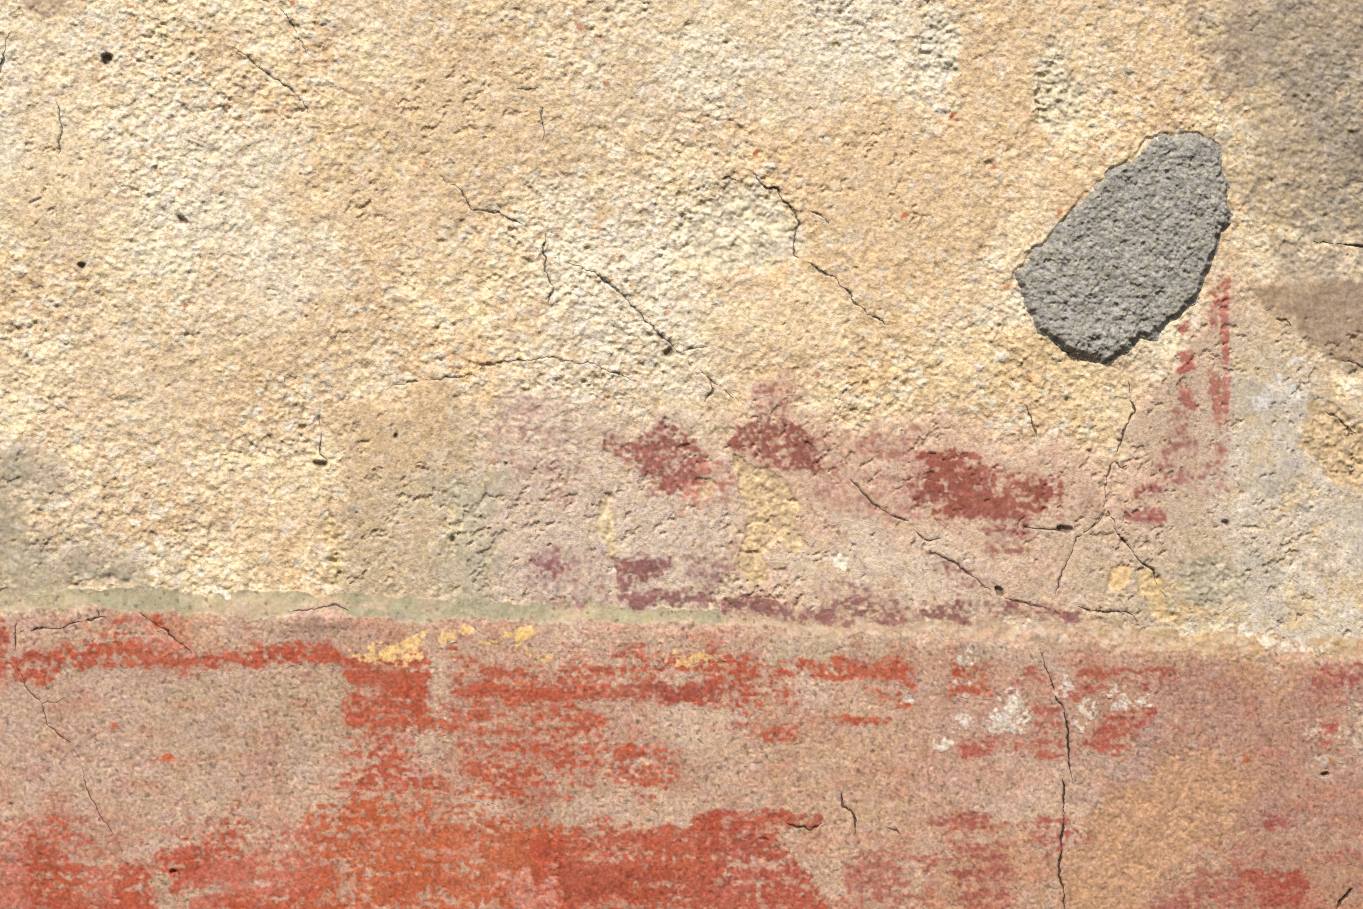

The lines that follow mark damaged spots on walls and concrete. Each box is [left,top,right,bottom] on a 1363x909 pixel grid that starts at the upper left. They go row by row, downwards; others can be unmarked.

crack [442,176,741,402]
crack [721,172,889,324]
crack [852,381,1166,622]
peeling [0,608,1096,909]
crack [1042,653,1073,908]
peeling [953,659,1183,765]
peeling [1142,842,1363,909]
peeling [1252,803,1303,834]
peeling [1305,654,1363,748]
crack [1336,888,1353,909]